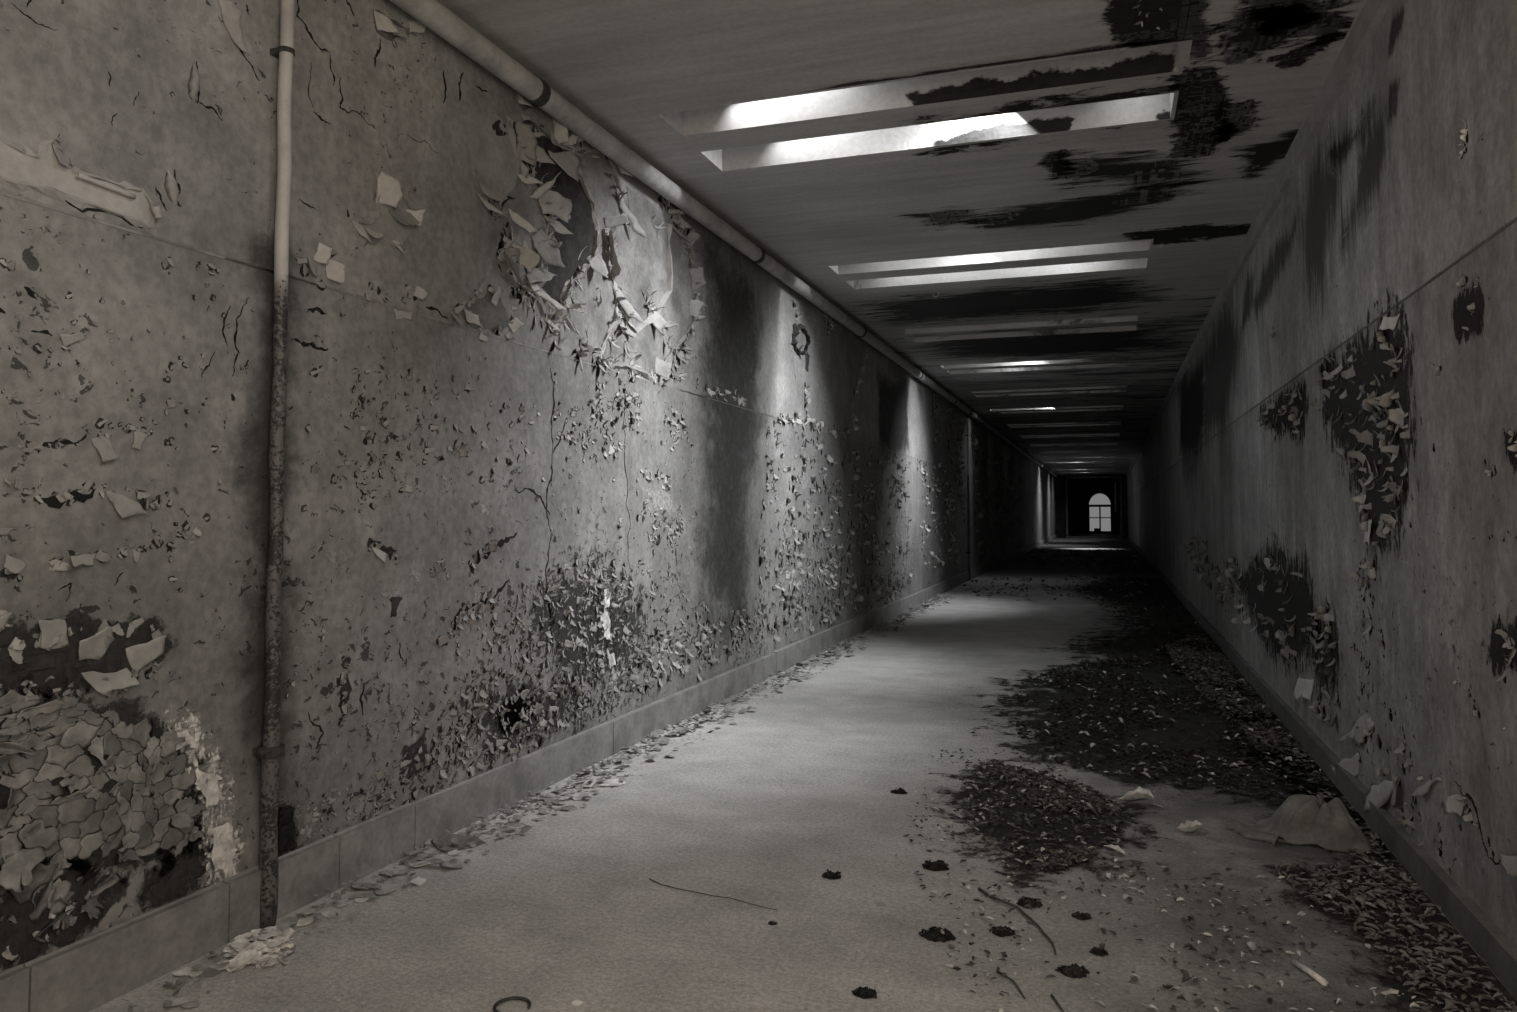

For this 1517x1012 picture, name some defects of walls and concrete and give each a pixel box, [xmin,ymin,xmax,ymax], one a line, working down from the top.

peeling [443,70,488,103]
peeling [0,130,182,229]
peeling [1450,276,1485,345]
peeling [8,261,255,462]
peeling [277,92,961,857]
peeling [1479,427,1517,478]
peeling [1211,288,1466,875]
peeling [1486,598,1517,684]